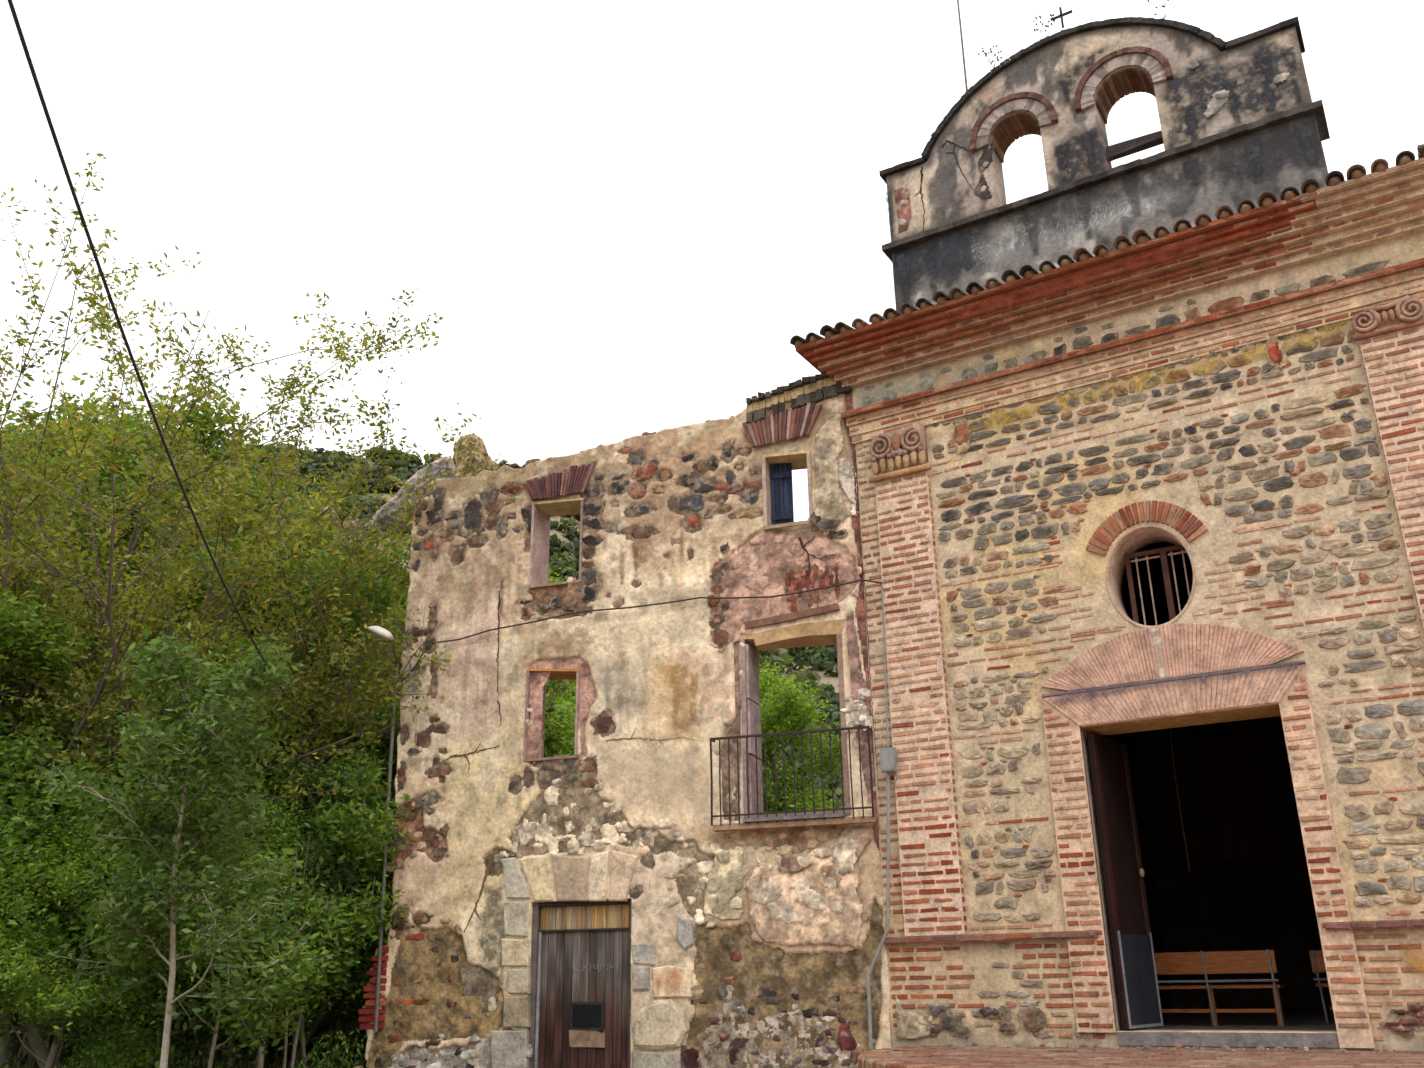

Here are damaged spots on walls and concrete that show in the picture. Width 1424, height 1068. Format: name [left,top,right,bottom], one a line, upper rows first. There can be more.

mould [1164,43,1301,143]
crack [914,140,973,228]
damp [885,132,1155,301]
spalling [412,483,537,572]
flaking render [484,389,1047,1068]
flaking render [355,906,517,1068]